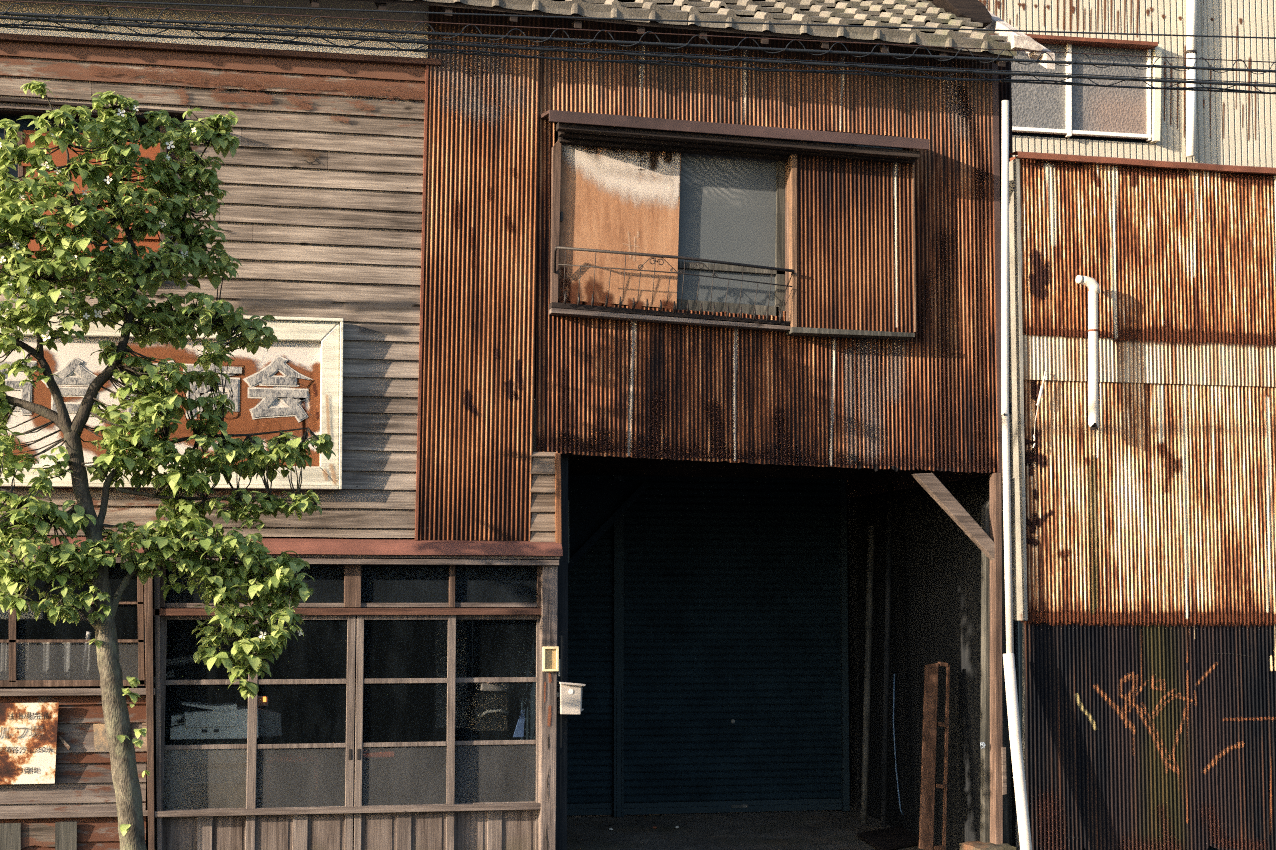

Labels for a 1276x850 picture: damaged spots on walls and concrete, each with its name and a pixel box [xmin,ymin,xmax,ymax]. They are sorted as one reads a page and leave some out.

corrosion [979,0,1182,38]
corrosion [1164,46,1186,138]
corrosion [1203,18,1256,141]
corrosion [1020,159,1101,187]
corrosion [1118,166,1189,187]
corrosion [1223,172,1275,186]
corrosion [536,92,996,472]
corrosion [1028,250,1050,300]
corrosion [1024,325,1276,347]
corrosion [1031,380,1040,400]
corrosion [1024,428,1053,546]
corrosion [1021,589,1276,746]